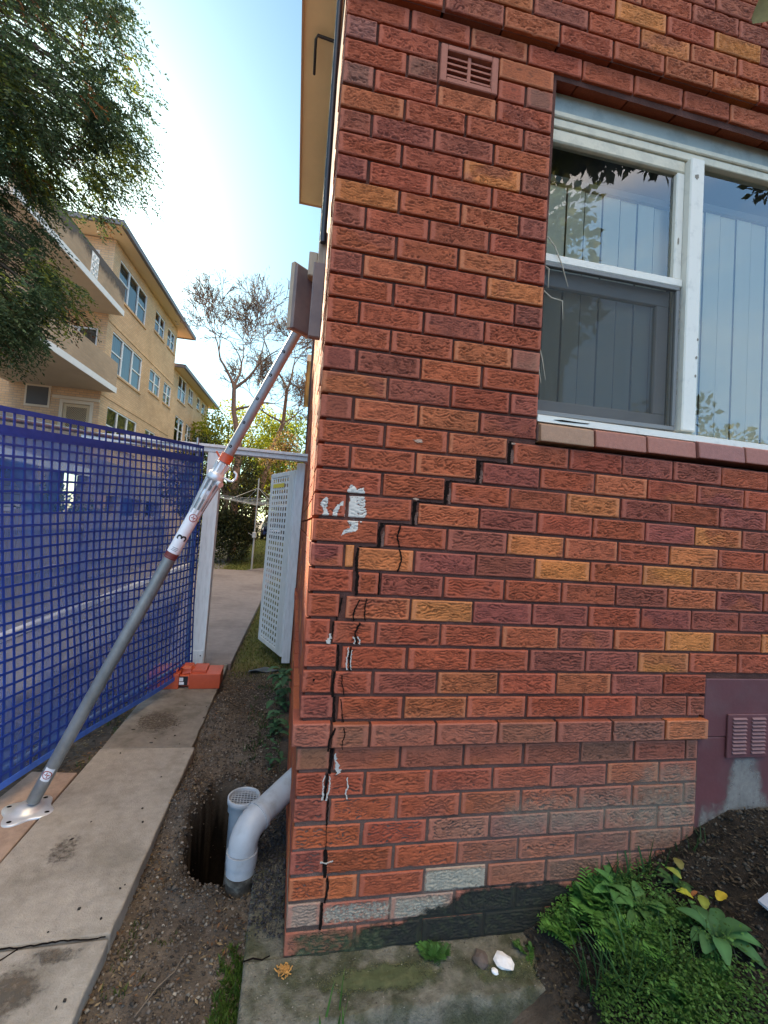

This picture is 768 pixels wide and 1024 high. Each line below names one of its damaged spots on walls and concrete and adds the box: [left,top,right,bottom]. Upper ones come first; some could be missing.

crack [319,441,514,930]
water stain [291,869,573,957]